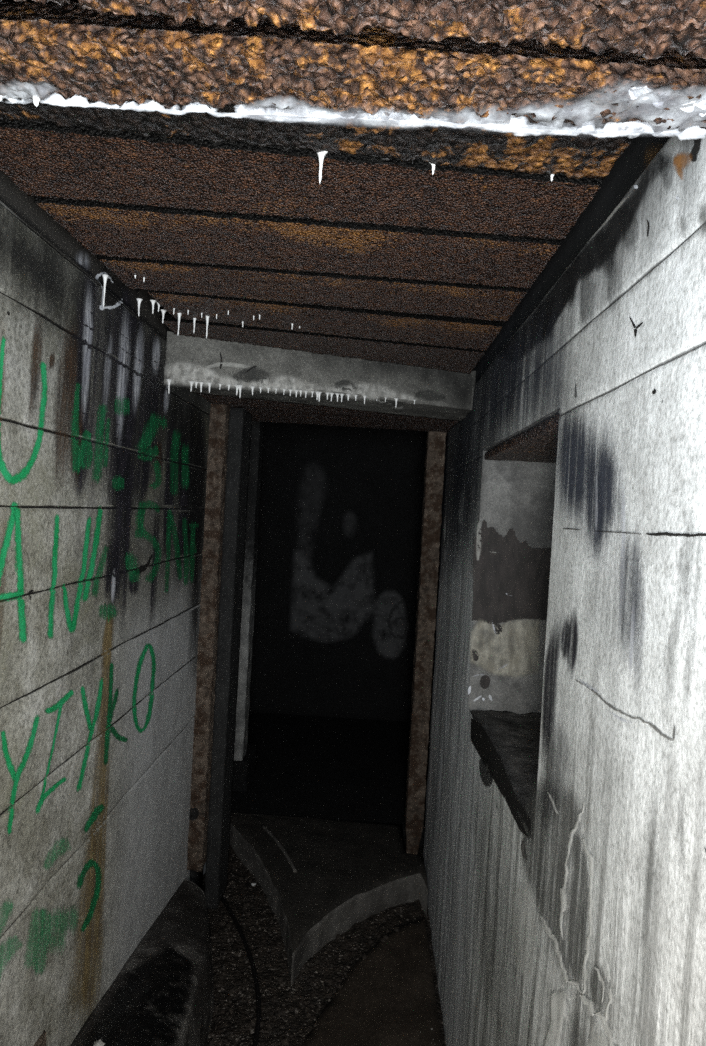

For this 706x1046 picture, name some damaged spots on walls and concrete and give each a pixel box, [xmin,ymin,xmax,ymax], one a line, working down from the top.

water stain [1,82,706,139]
crack [689,138,701,162]
water stain [73,263,413,641]
water stain [562,423,639,660]
corrosion [77,616,113,1001]
crack [540,792,613,1046]
crack [576,680,675,741]